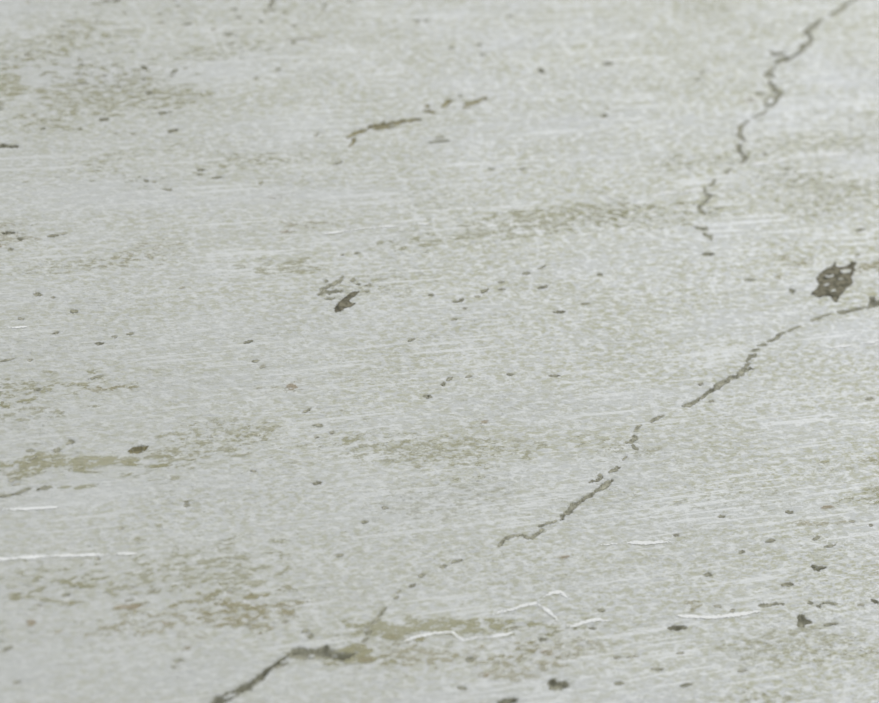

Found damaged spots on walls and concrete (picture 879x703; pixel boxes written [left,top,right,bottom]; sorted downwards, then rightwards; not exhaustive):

crack [347,97,488,147]
crack [695,0,855,241]
spalling [811,253,861,302]
crack [498,296,879,547]
crack [758,600,785,608]
crack [807,600,838,608]
crack [210,558,463,703]